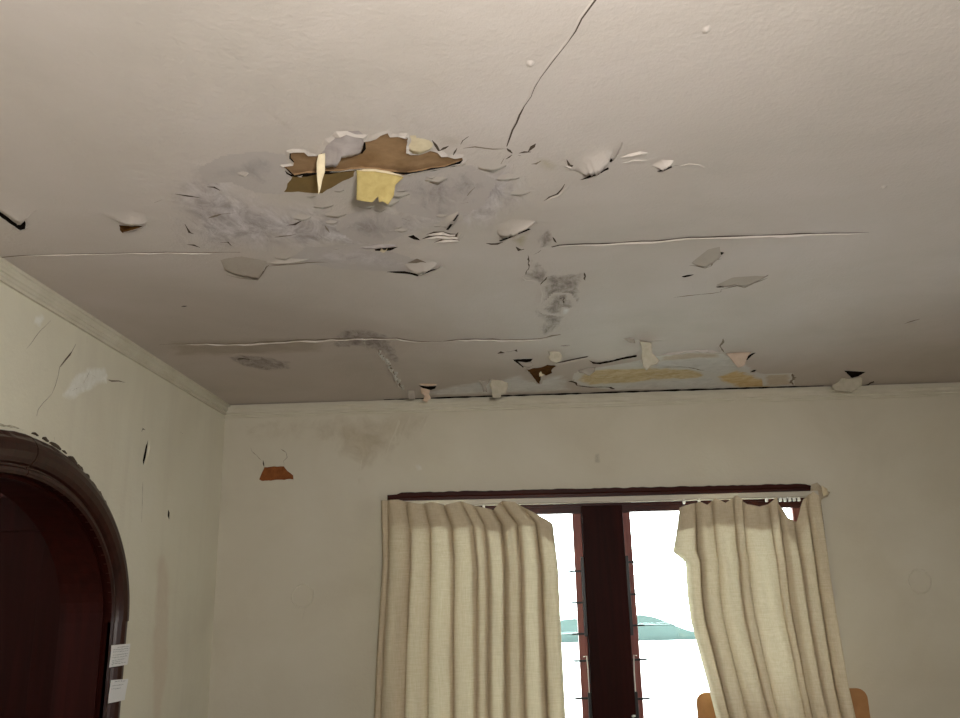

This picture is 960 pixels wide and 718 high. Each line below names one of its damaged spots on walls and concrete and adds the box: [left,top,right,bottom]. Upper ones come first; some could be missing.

crack [467,0,596,201]
leakage [131,105,570,272]
peeling [280,130,469,204]
crack [2,251,241,259]
flaking render [515,227,592,339]
crack [552,232,869,249]
peeling [680,275,768,297]
crack [37,344,76,417]
peeling [514,351,562,384]
peeling [568,334,799,391]
peeling [832,371,874,393]
flaking render [254,449,296,484]